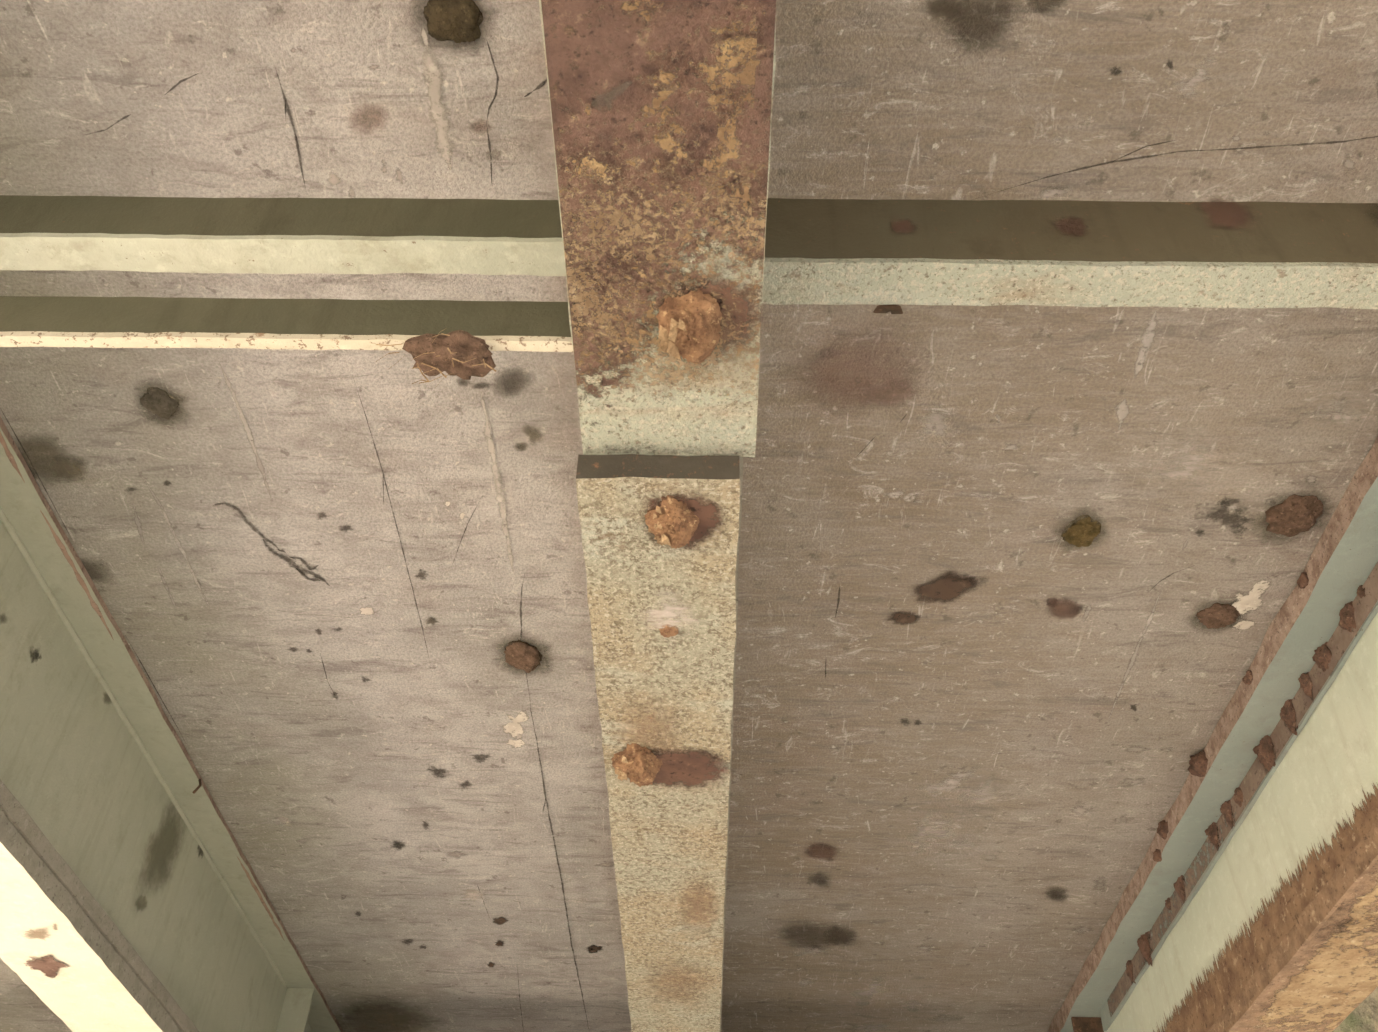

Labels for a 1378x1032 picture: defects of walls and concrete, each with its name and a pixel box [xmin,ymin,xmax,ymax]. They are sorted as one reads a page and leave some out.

leakage [931,0,1010,46]
crack [487,41,547,182]
crack [973,136,1378,200]
rust [541,0,776,433]
crack [518,574,526,635]
rust [1047,598,1080,618]
rust [1107,562,1378,1032]
leakage [149,819,177,880]
crack [526,673,589,1029]
peeling [28,925,57,939]
peeling [26,955,69,978]
leakage [786,925,852,956]